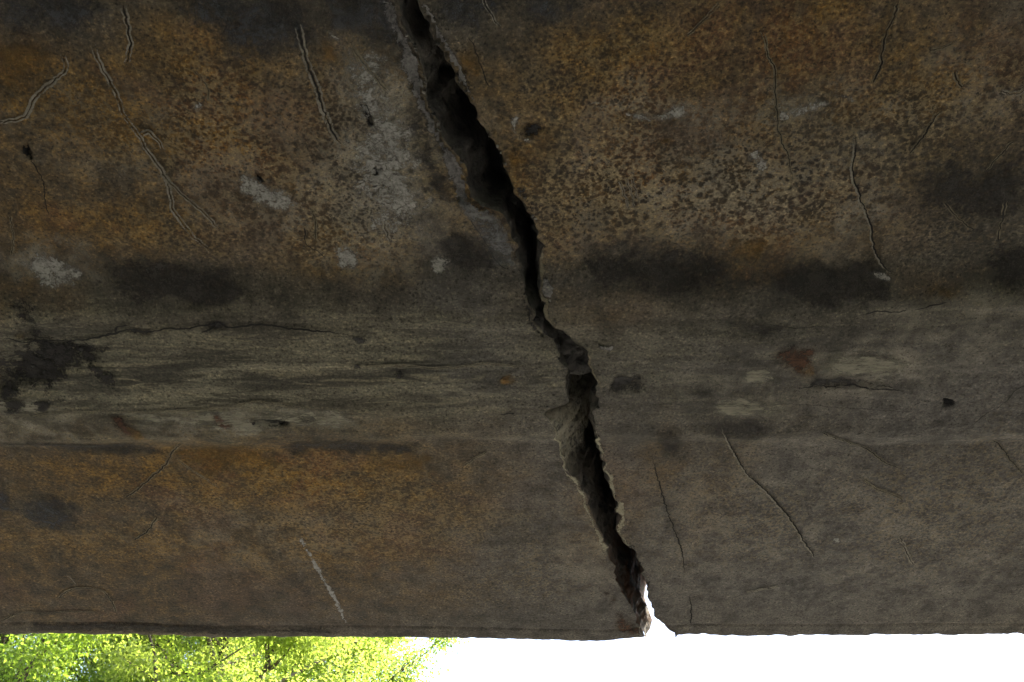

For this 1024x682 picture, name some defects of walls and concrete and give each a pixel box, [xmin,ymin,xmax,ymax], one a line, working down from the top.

crack [0,55,69,124]
crack [91,5,219,252]
crack [294,24,347,147]
crack [761,23,793,187]
crack [870,1,900,89]
crack [849,135,894,275]
crack [6,322,347,343]
crack [357,362,517,370]
crack [398,0,692,638]
damp [776,261,891,308]
crack [722,430,818,563]